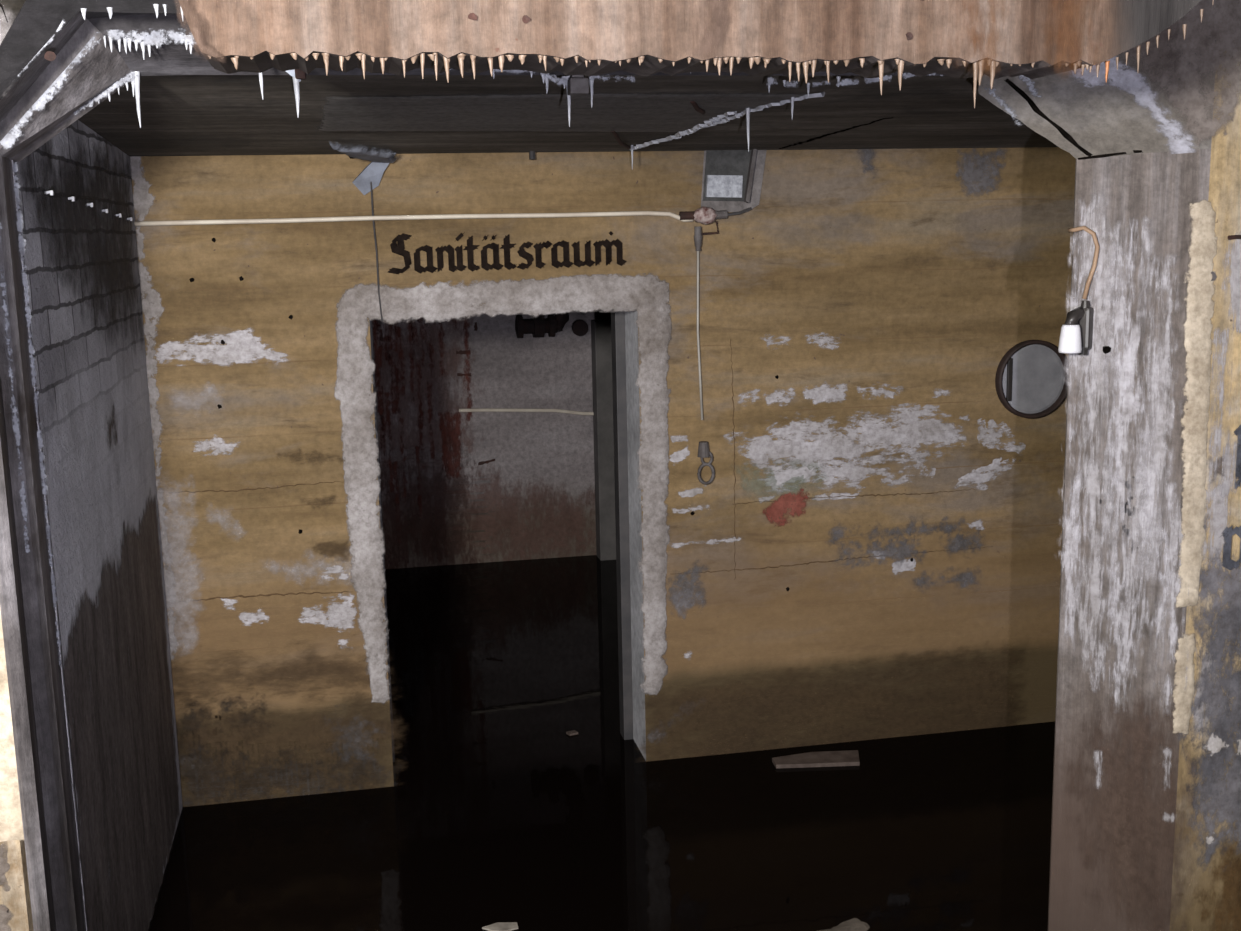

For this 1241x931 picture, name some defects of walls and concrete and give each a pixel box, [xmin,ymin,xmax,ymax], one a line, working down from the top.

leakage [0,29,194,149]
crack [1004,79,1142,160]
leakage [1072,22,1194,154]
peeling [806,333,839,350]
leakage [0,270,30,553]
rust [372,316,478,522]
peeling [723,384,1026,492]
leakage [1061,197,1185,705]
leakage [12,141,396,931]
leakage [1164,239,1241,864]
leakage [648,657,1018,759]